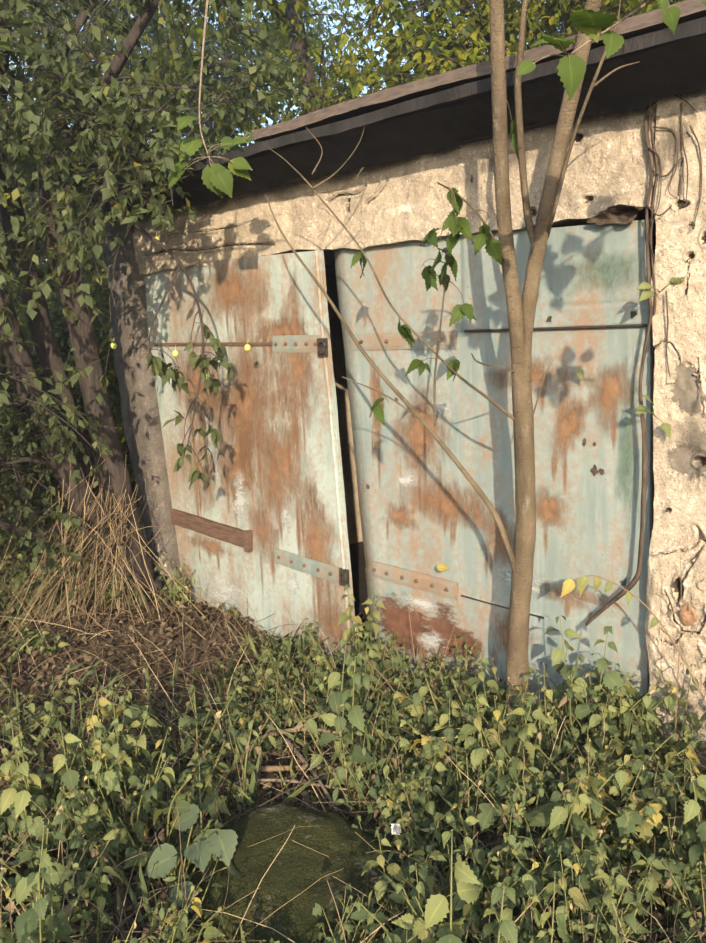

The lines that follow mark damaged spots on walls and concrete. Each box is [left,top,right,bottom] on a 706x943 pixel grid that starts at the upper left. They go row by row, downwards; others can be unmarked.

spalling [586,206,645,225]
corrosion [372,370,384,475]
corrosion [387,391,513,572]
corrosion [552,400,580,481]
corrosion [590,366,625,440]
flaking render [666,364,706,416]
flaking render [668,442,706,481]
corrosion [536,494,560,545]
spalling [672,577,684,596]
crack [655,526,706,646]
corrosion [377,593,482,667]